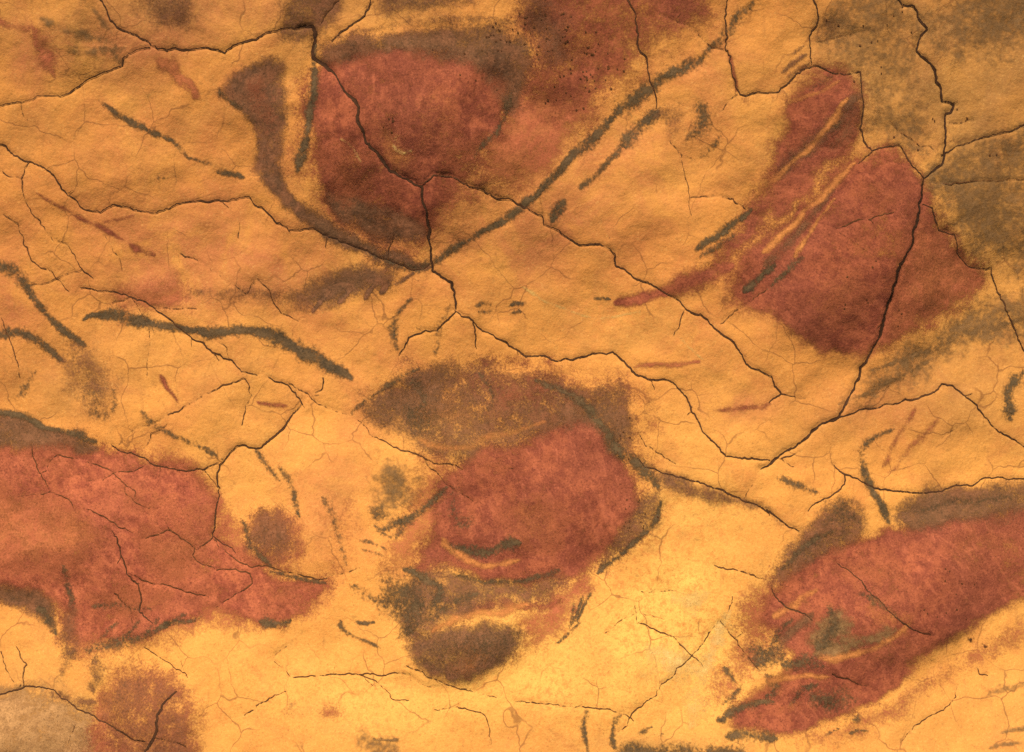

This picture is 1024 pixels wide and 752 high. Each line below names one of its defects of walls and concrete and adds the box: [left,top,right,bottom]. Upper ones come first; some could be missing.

crack [0,0,1024,469]
crack [31,287,327,607]
crack [358,420,473,501]
crack [639,435,799,531]
crack [808,465,1024,511]
crack [90,509,203,627]
crack [715,565,813,621]
crack [837,563,931,635]
crack [0,646,187,752]
crack [247,590,760,737]